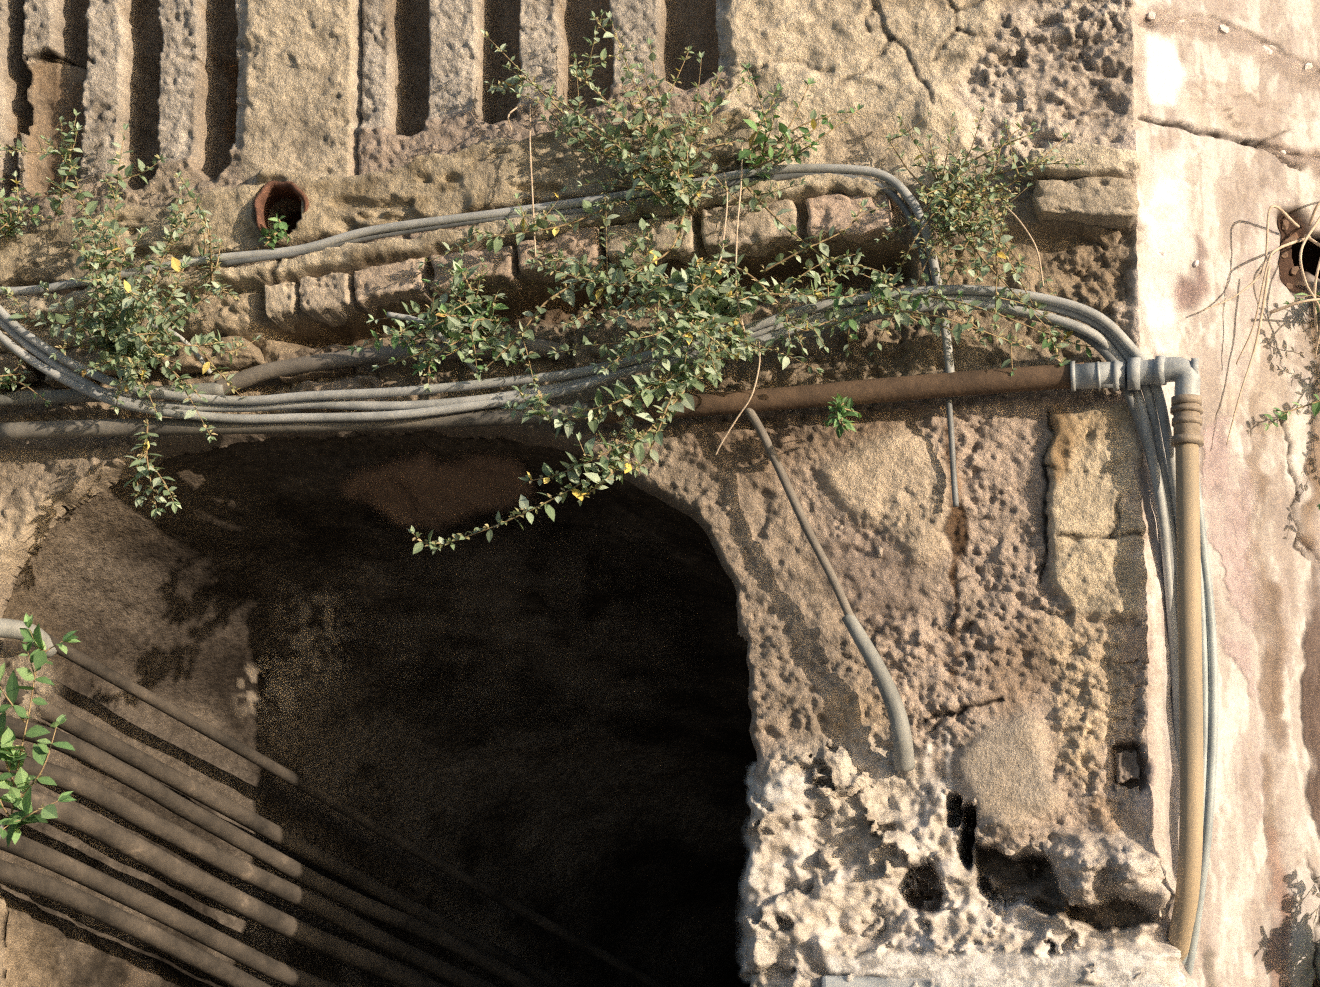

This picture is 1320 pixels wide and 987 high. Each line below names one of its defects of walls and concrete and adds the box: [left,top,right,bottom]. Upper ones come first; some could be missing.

crack [1138,118,1301,171]
water stain [1309,305,1320,390]
crack [1035,419,1142,582]
water stain [1249,447,1269,495]
crack [1279,419,1312,556]
water stain [1301,416,1320,551]
spalling [1110,737,1146,790]
water stain [1261,567,1292,987]
water stain [1303,596,1320,832]
water stain [742,834,761,980]
spalling [905,863,947,911]
spalling [944,788,1171,930]